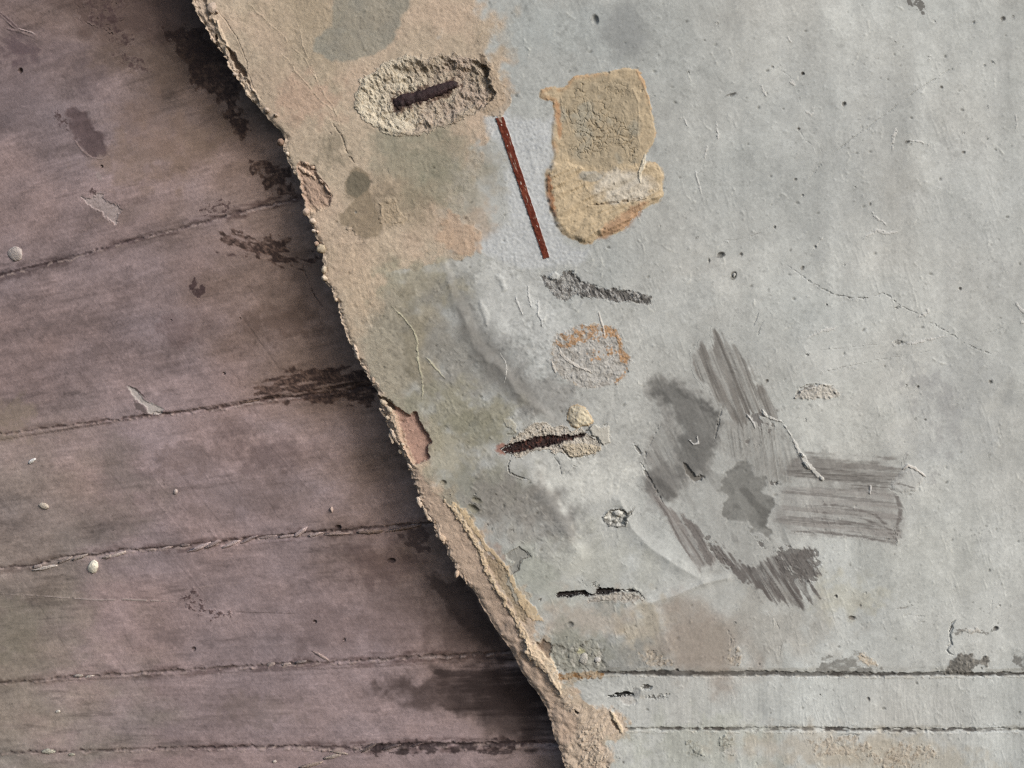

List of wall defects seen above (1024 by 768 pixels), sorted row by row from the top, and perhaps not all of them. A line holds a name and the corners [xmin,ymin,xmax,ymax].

spalling [352,51,654,307]
corrosion [546,310,635,392]
flaking render [277,134,637,768]
leakage [655,497,715,568]
leakage [789,488,906,547]